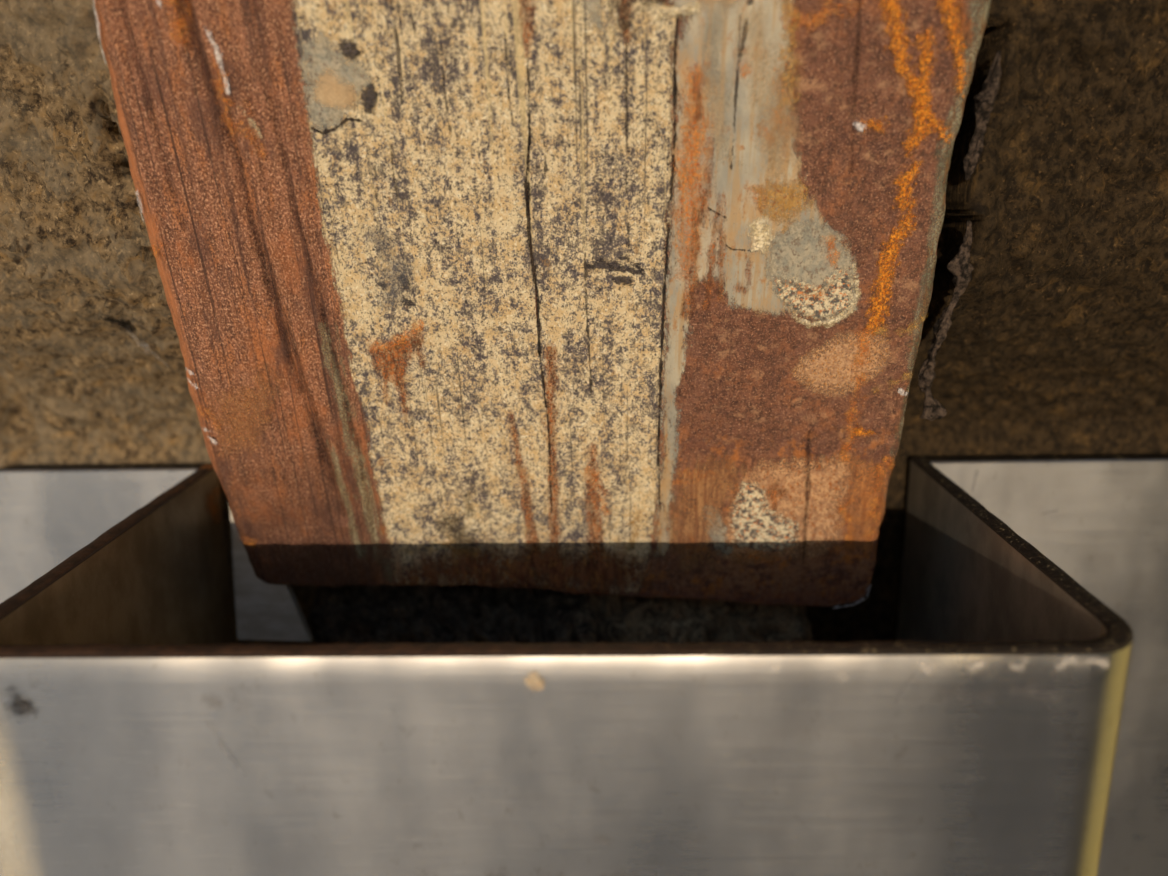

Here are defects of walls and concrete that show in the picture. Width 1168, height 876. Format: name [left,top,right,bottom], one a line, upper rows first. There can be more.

peeling [297,32,378,134]
corrosion [370,320,425,421]
crack [504,36,553,513]
crack [584,253,592,394]
peeling [747,217,861,328]
corrosion [840,0,970,461]
corrosion [509,347,563,589]
corrosion [584,443,611,594]
peeling [729,480,800,564]